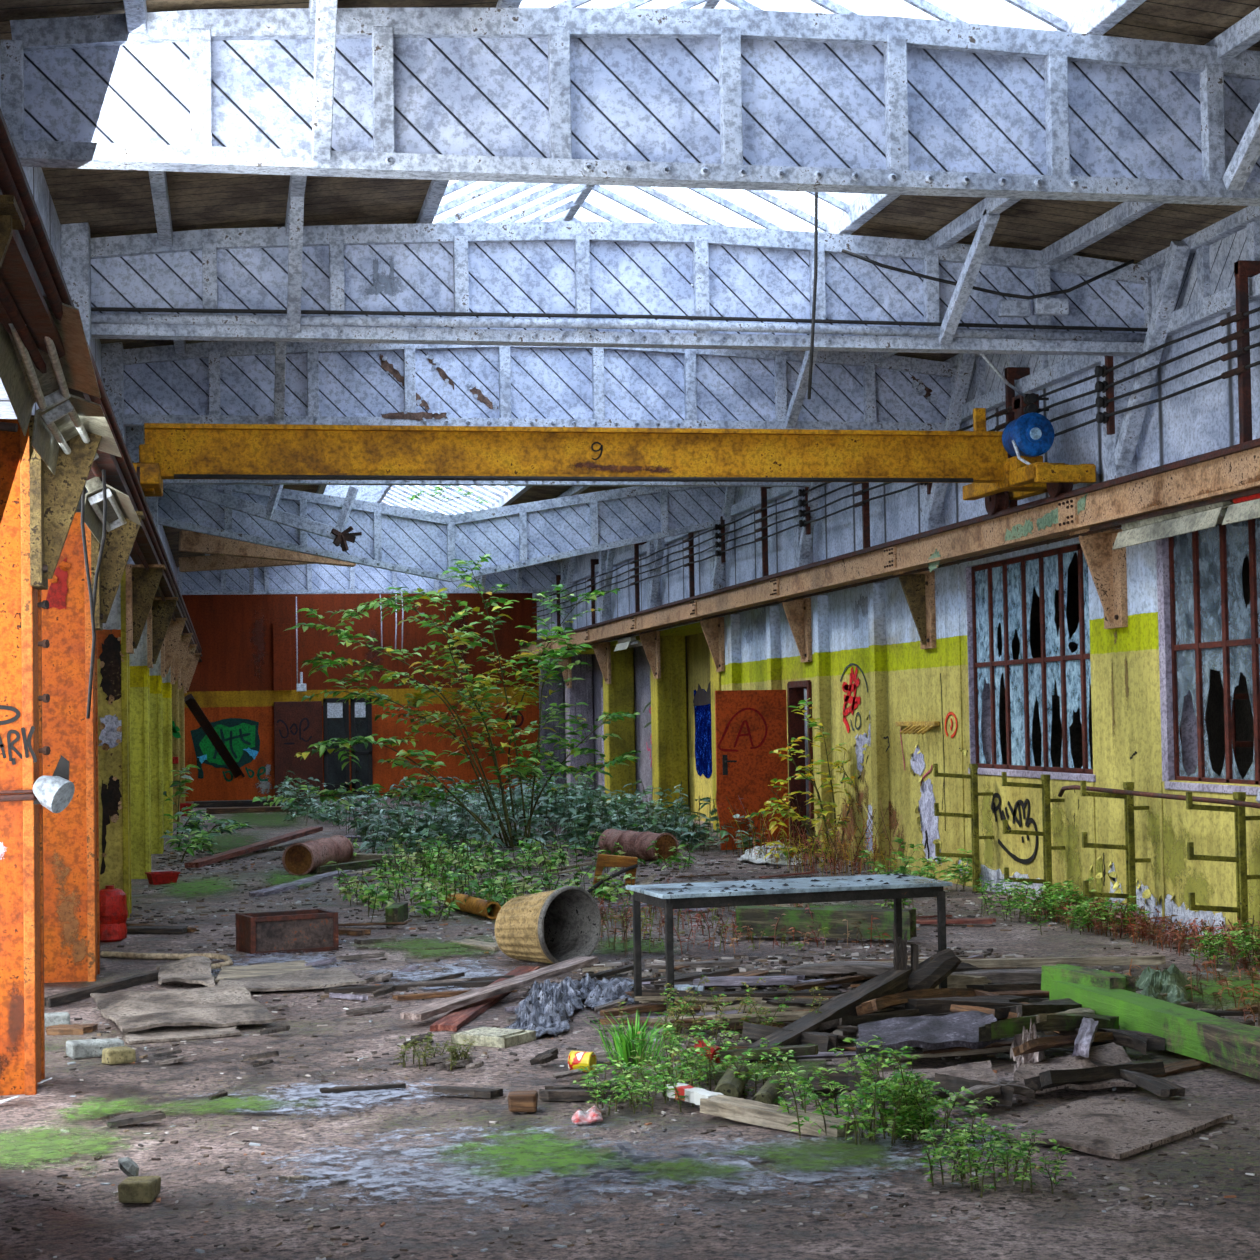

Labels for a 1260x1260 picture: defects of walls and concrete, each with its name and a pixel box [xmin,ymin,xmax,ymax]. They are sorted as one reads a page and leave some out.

rust [574,461,672,473]
peeling [98,634,124,751]
peeling [909,744,1043,900]
rust [51,853,88,962]
rust [0,987,24,1076]